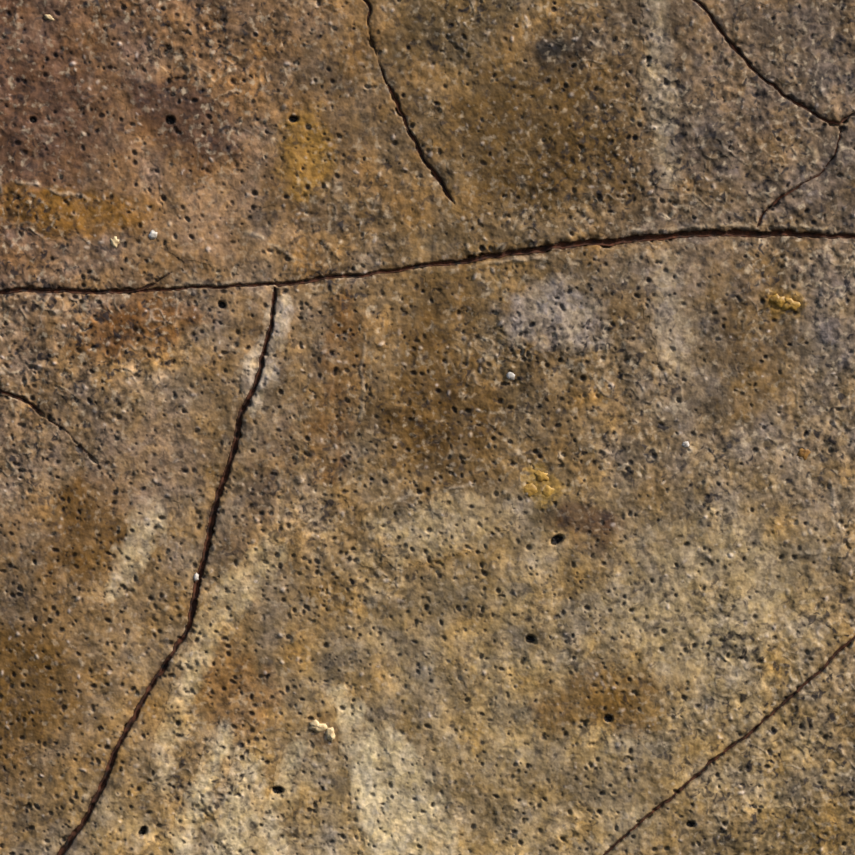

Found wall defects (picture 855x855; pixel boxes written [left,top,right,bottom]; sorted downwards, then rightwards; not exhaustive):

crack [363,0,455,204]
crack [693,0,855,124]
crack [757,129,842,227]
crack [0,230,855,855]